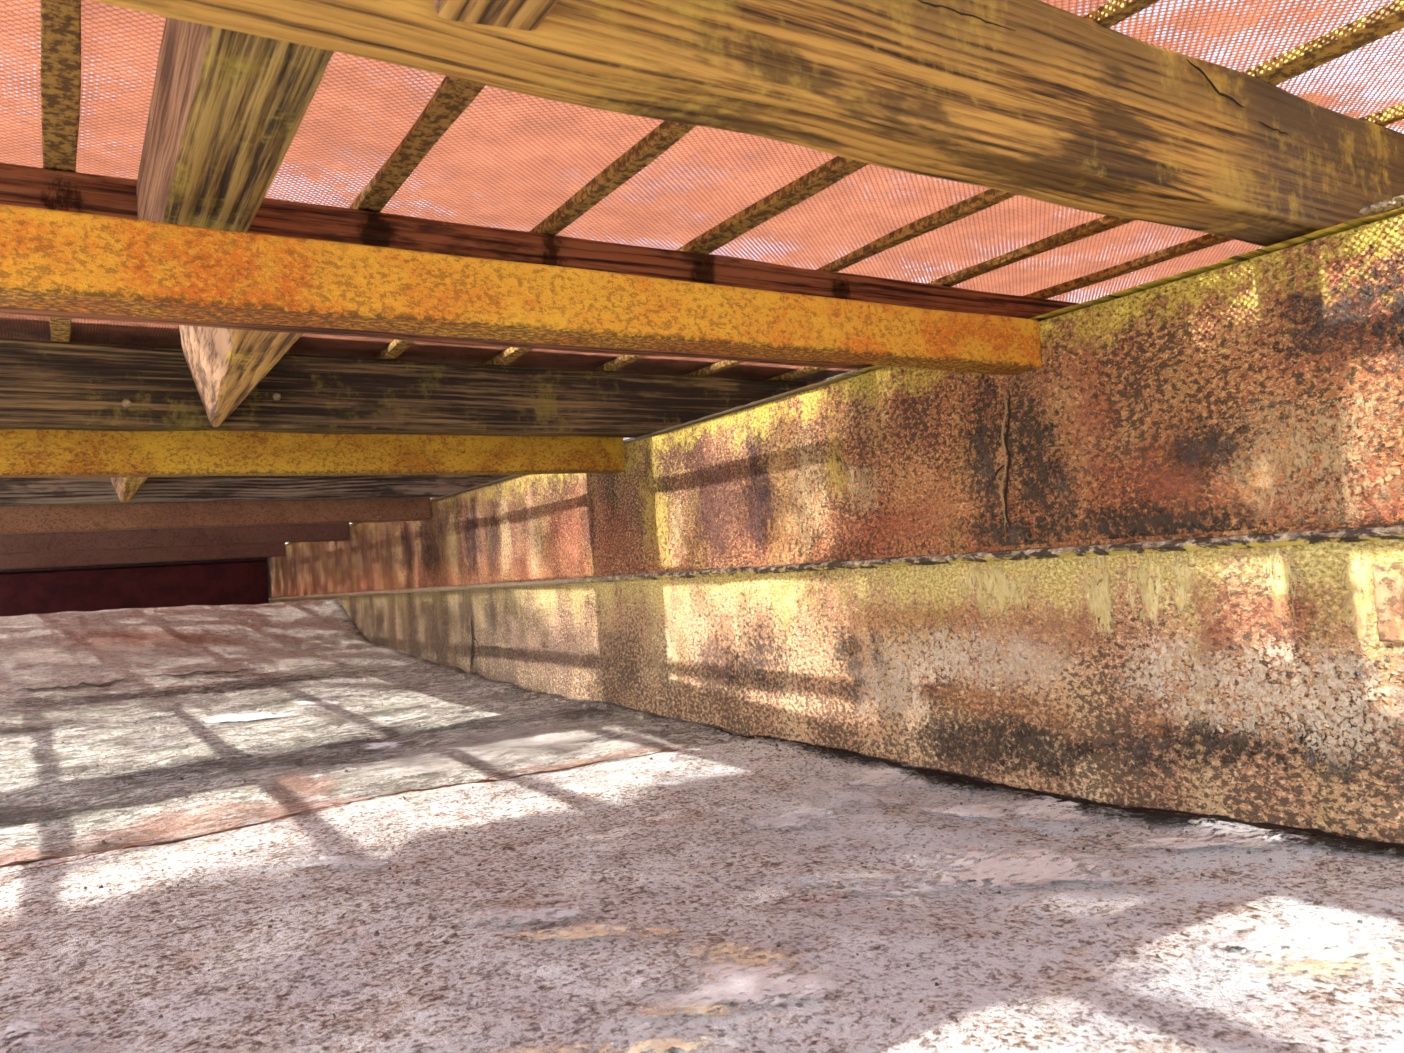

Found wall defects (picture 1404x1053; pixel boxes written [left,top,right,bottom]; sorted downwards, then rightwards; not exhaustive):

leakage [638,456,673,569]
leakage [749,443,772,547]
crack [985,387,1011,533]
leakage [910,658,1404,798]
leakage [747,767,1091,830]